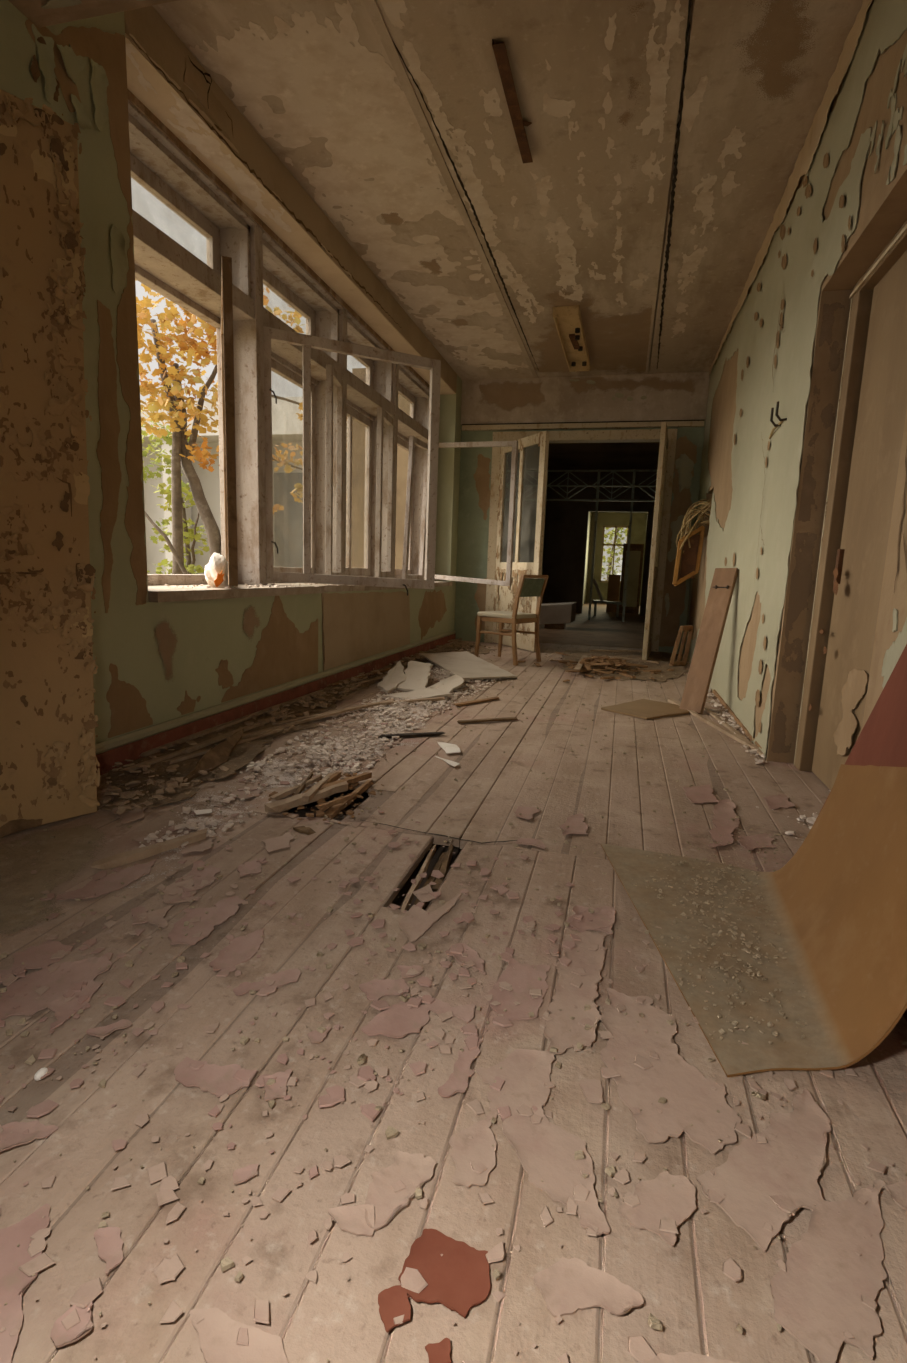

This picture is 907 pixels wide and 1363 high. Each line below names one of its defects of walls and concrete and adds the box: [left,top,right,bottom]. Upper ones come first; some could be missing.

flaking render [25,19,147,660]
flaking render [473,432,543,636]
flaking render [106,663,153,738]
flaking render [215,596,318,702]
flaking render [418,590,447,640]